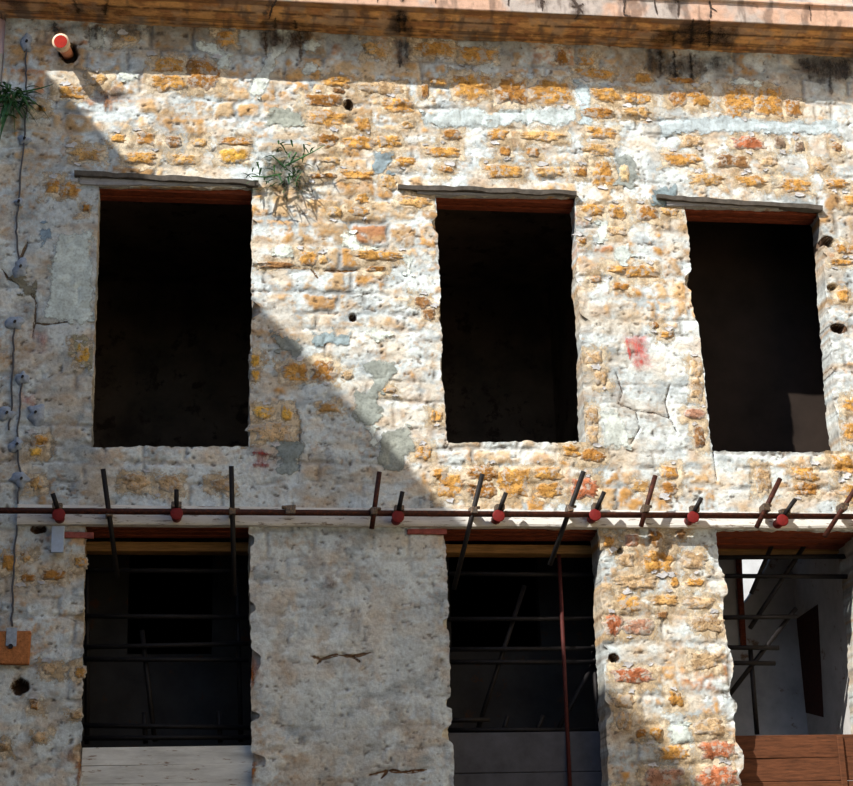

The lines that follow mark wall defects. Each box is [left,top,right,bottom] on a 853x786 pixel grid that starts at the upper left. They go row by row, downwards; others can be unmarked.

water stain [259,18,313,61]
water stain [392,10,412,67]
water stain [650,19,737,80]
water stain [799,58,852,94]
spalling [295,37,853,297]
spalling [255,244,331,275]
spalling [248,343,354,417]
spalling [407,345,634,507]
crack [616,375,677,438]
spalling [677,354,711,455]
spalling [785,389,853,509]
spalling [605,653,742,786]